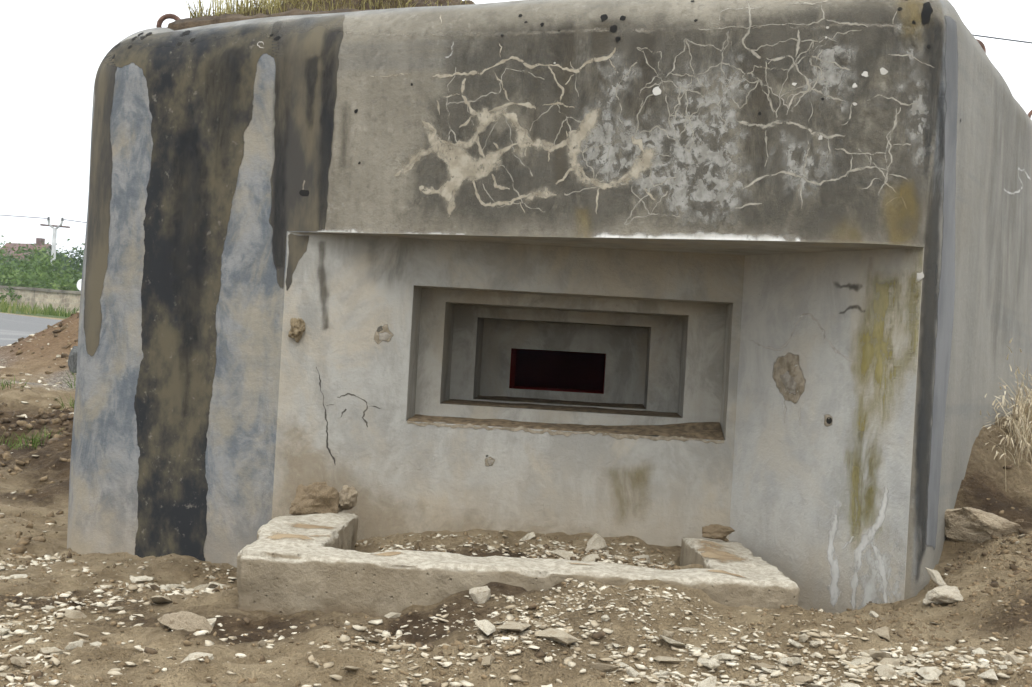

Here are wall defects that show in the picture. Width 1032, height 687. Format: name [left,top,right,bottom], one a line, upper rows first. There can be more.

crack [370,0,918,225]
damp [84,17,364,561]
crack [316,367,381,464]
damp [417,9,944,609]
spalling [773,353,805,425]